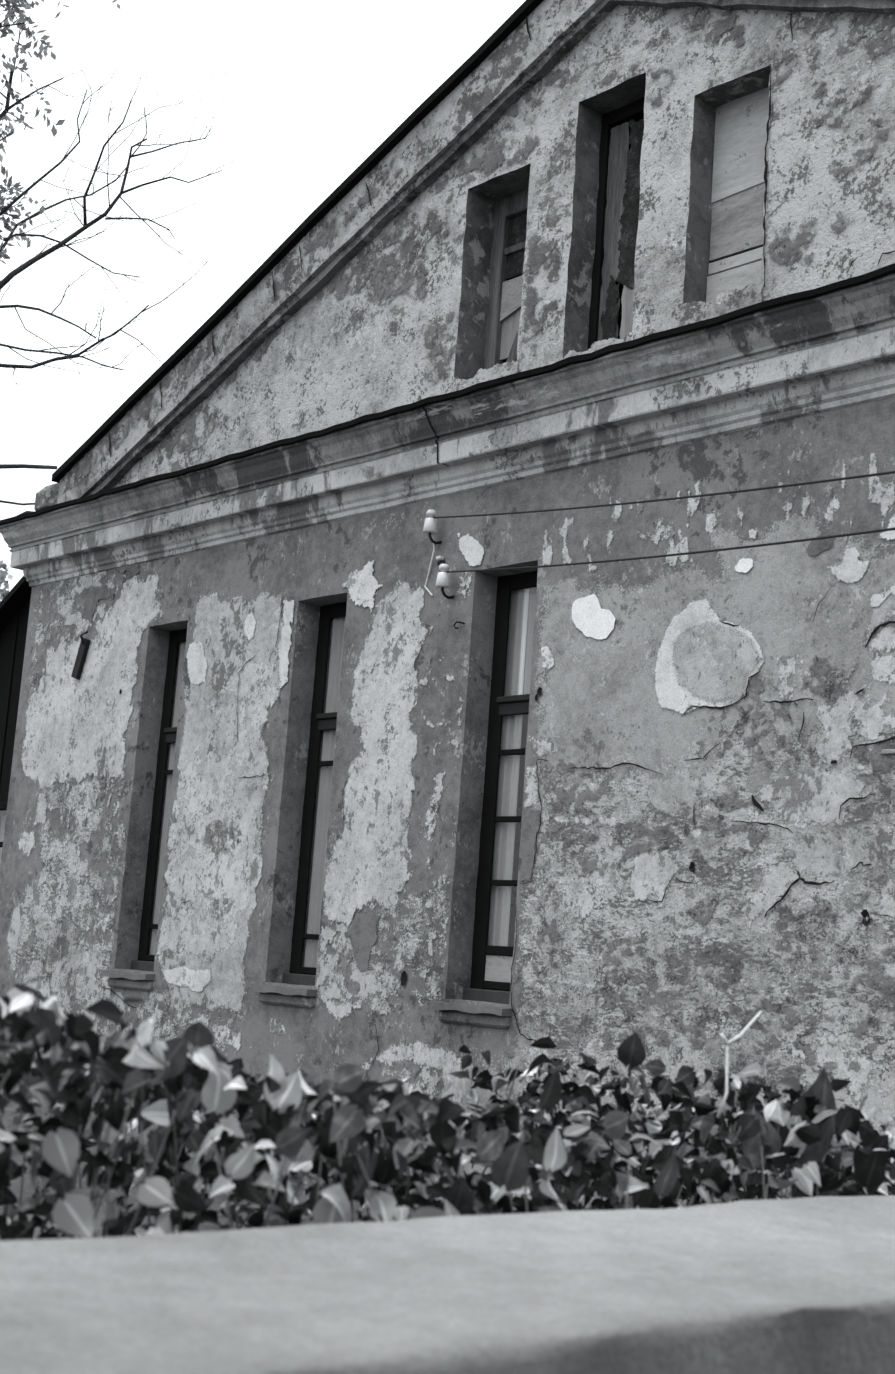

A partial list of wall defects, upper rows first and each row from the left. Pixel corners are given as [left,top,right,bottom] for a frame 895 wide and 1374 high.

peeling [536,479,716,572]
peeling [457,533,484,598]
peeling [572,594,615,639]
peeling [647,581,895,929]
crack [850,736,895,758]
peeling [18,549,164,1051]
peeling [156,599,294,992]
peeling [315,560,464,1021]
crack [730,795,793,833]
crack [839,793,876,819]
crack [764,862,872,918]
peeling [360,1041,463,1107]